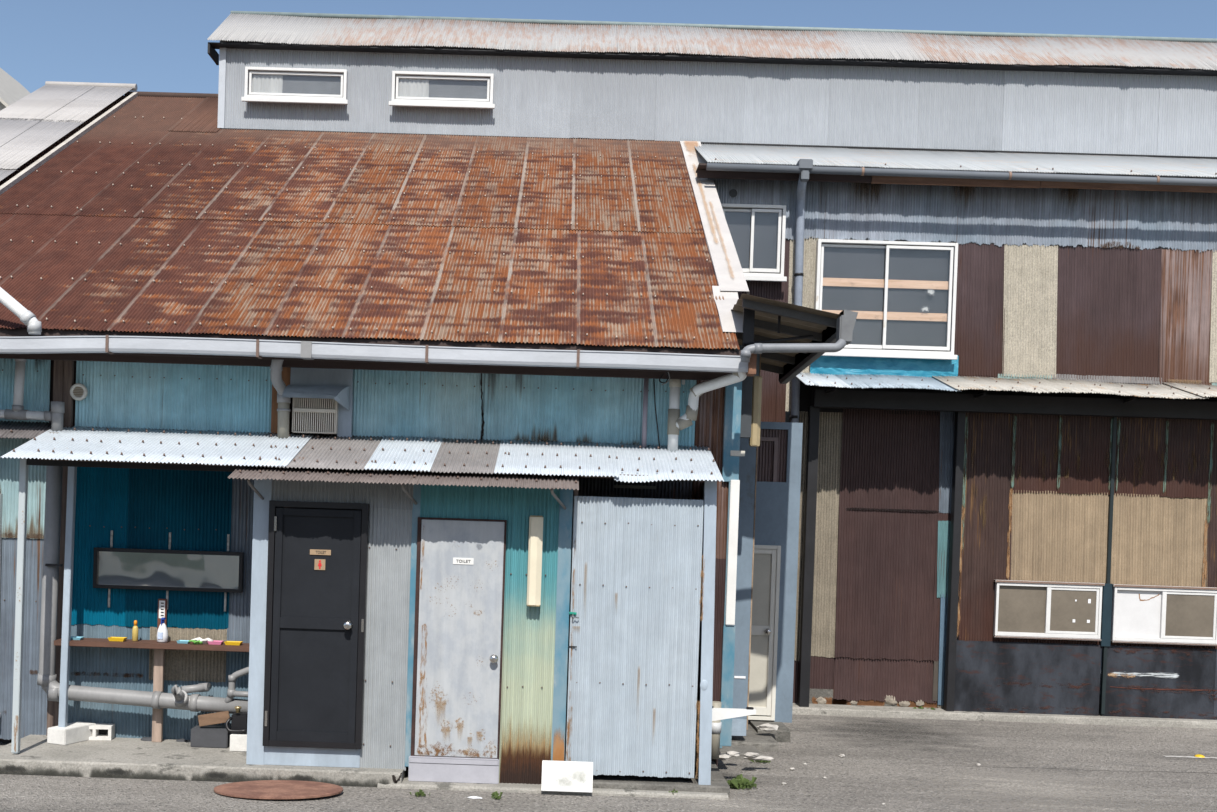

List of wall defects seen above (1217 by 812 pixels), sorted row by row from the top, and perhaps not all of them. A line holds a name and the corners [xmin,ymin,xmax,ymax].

crack [478,373,486,440]
corrosion [418,624,572,784]